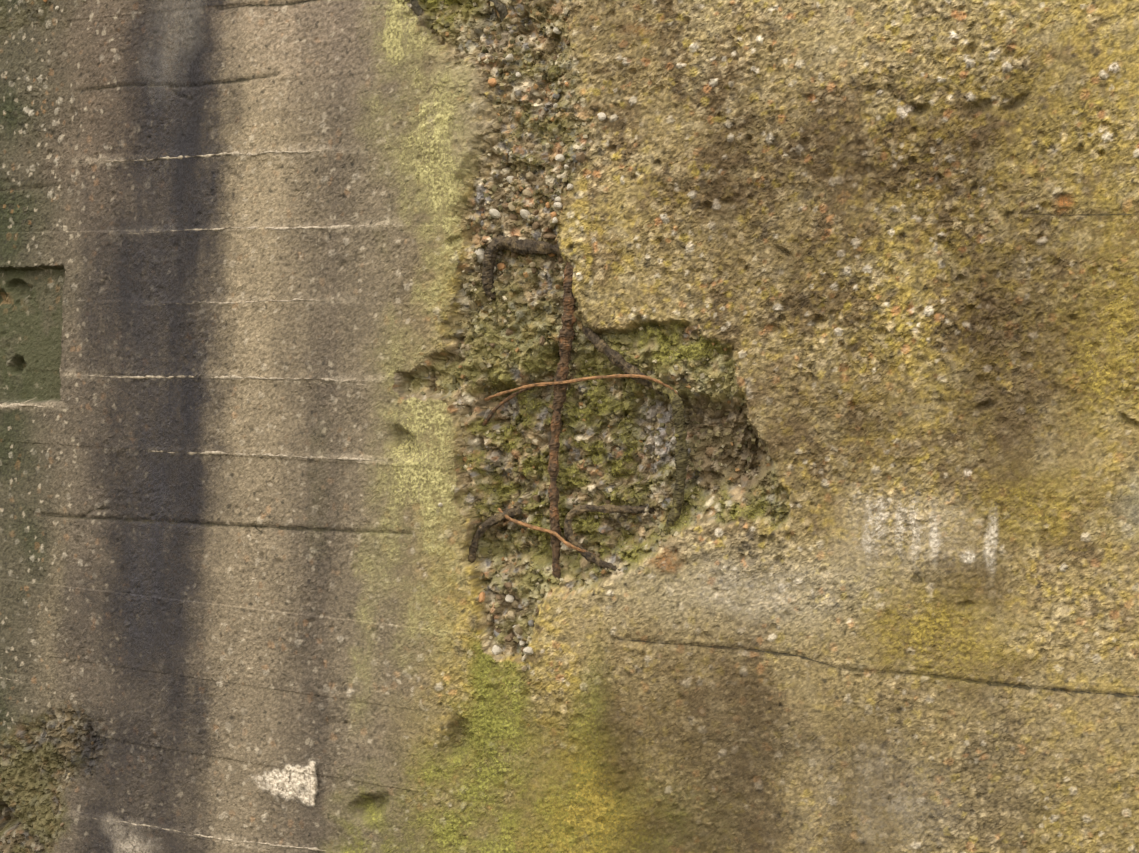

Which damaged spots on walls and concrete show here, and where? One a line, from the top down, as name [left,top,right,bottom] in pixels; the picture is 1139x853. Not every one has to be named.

spalling [390,0,791,671]
crack [619,639,1139,698]
spalling [0,702,113,853]